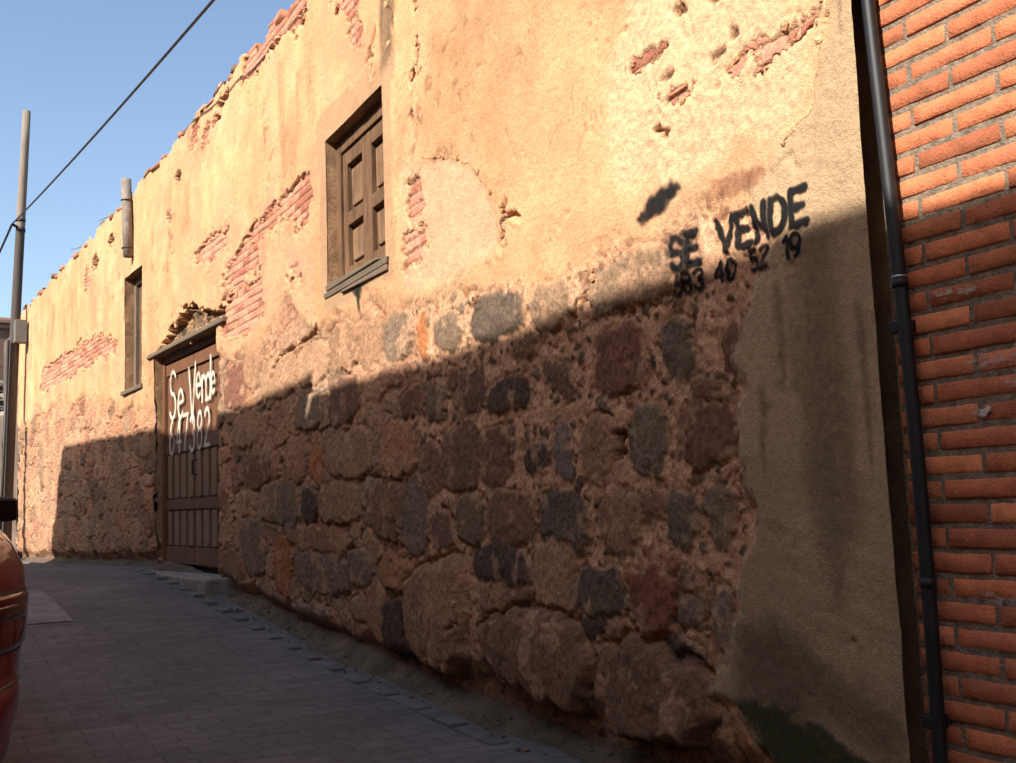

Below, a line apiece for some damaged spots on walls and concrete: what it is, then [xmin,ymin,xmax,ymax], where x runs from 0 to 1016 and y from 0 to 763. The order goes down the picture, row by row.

spalling [332,0,363,49]
spalling [625,43,668,75]
spalling [657,77,698,106]
spalling [725,0,829,147]
spalling [192,120,210,153]
peeling [421,152,498,202]
spalling [403,176,432,274]
spalling [173,174,314,344]
spalling [41,335,118,393]